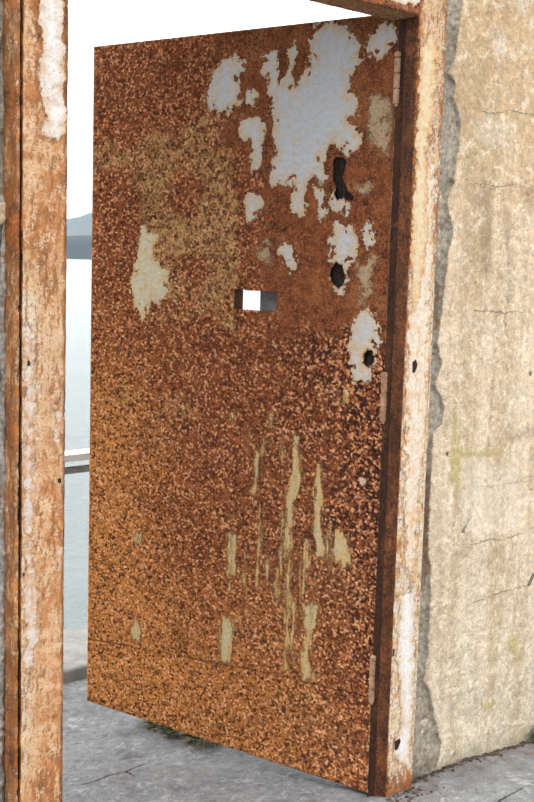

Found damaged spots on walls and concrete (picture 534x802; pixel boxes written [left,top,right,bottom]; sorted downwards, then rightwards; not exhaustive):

peeling [200,21,398,386]
crack [474,310,523,324]
spalling [391,0,462,780]
rust [421,473,430,584]
crack [461,531,529,574]
crack [471,584,528,604]